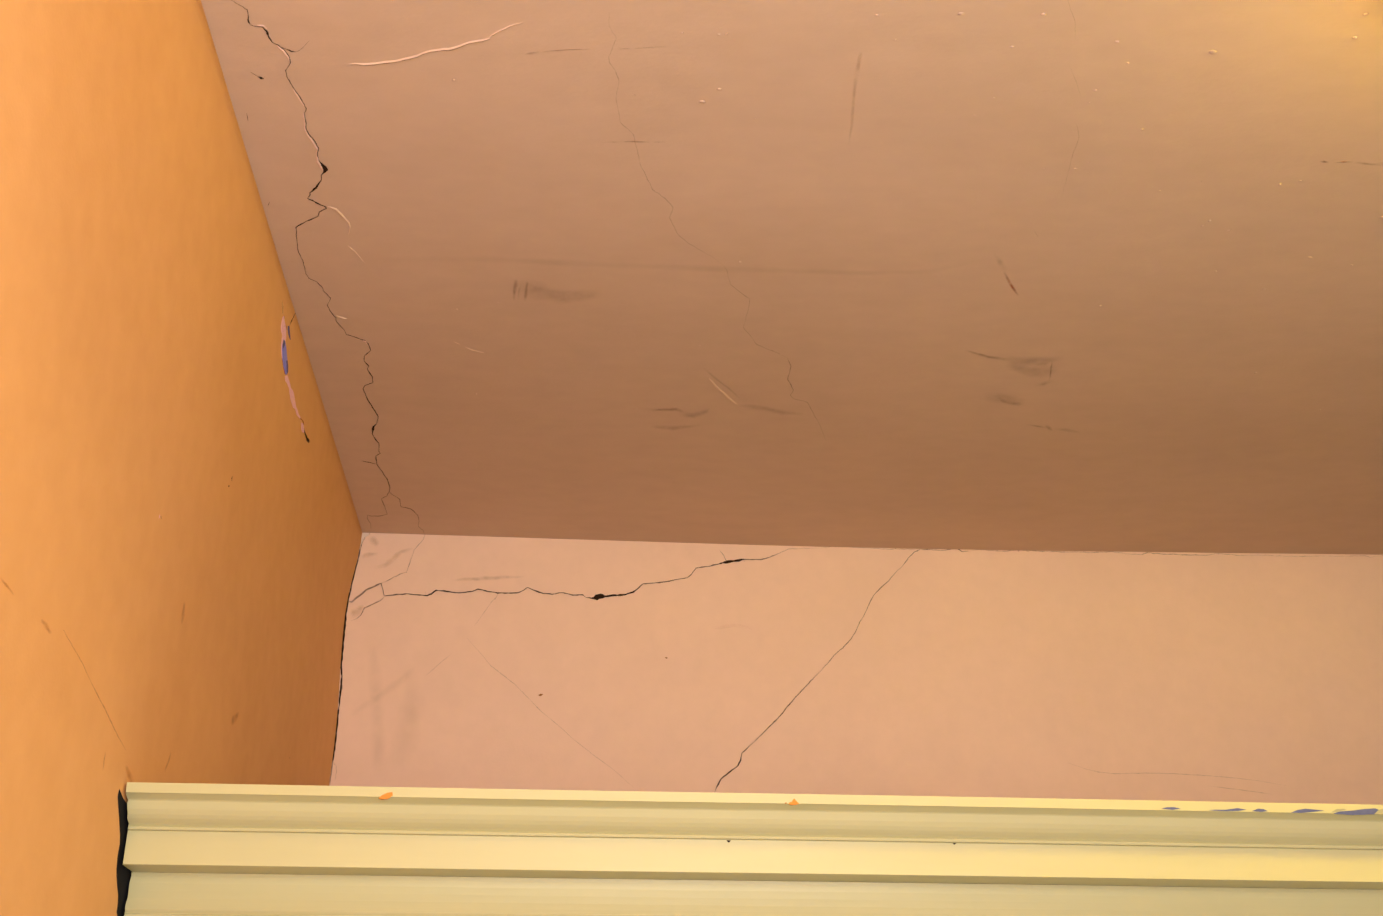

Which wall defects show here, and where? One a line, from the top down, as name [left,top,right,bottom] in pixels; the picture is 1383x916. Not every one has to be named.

spalling [281,316,310,443]
crack [235,2,776,775]
crack [716,548,963,788]